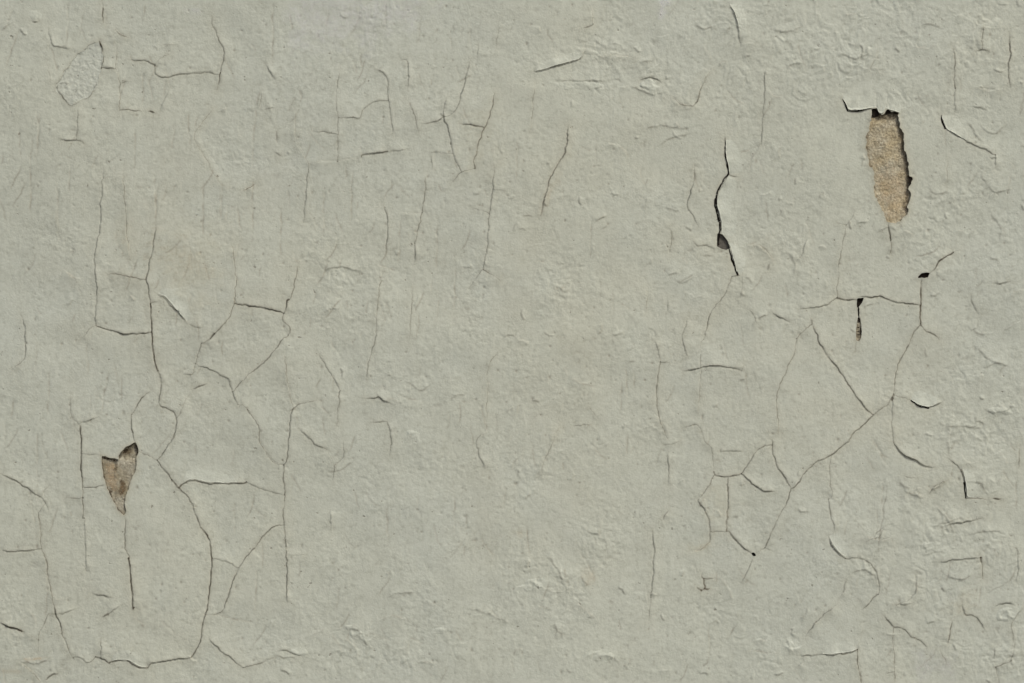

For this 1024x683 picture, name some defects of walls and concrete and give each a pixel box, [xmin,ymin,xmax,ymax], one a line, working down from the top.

crack [714,140,739,276]
peeling [843,77,913,223]
crack [858,290,922,324]
peeling [102,443,138,515]